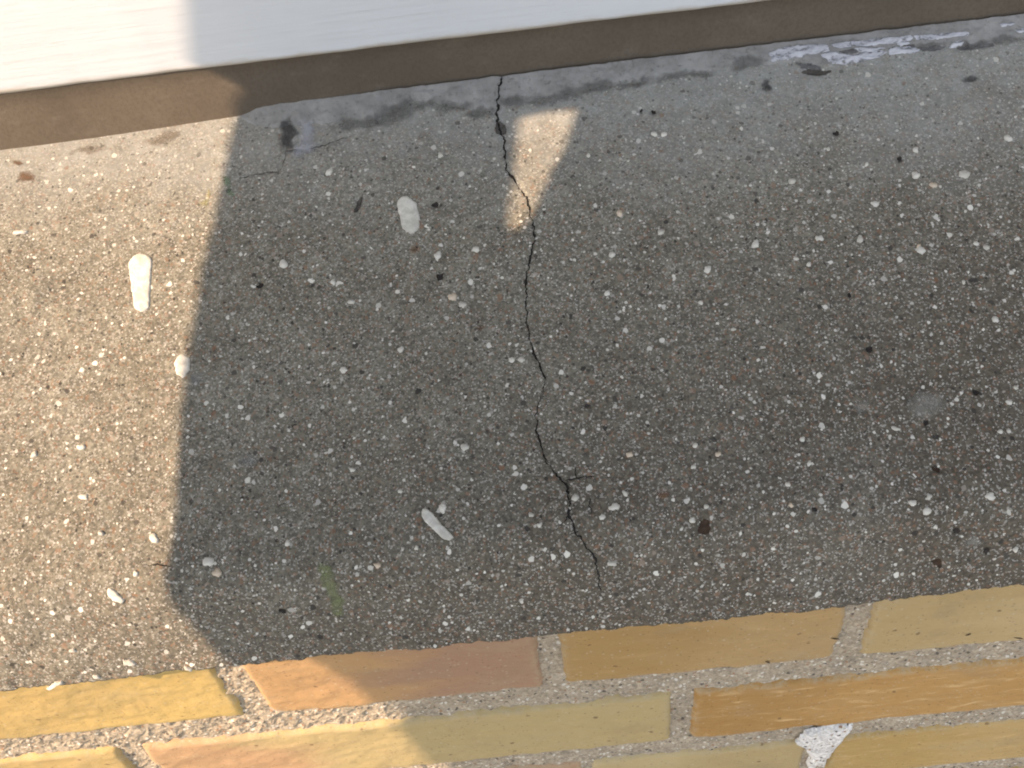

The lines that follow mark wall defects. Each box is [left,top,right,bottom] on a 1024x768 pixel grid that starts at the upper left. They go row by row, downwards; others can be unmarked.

crack [495,77,601,590]